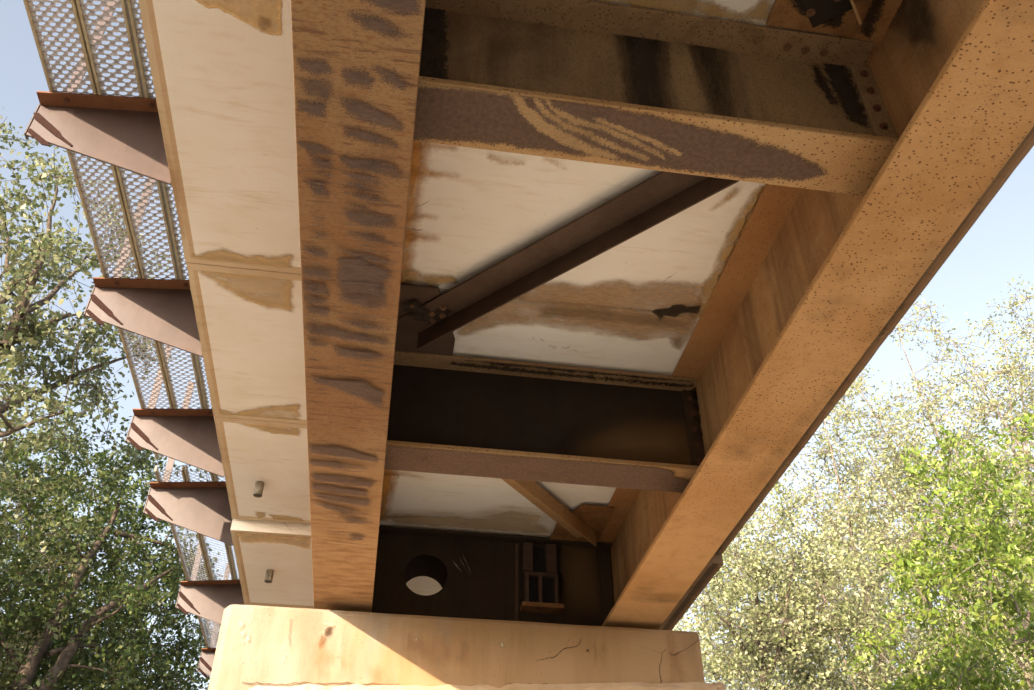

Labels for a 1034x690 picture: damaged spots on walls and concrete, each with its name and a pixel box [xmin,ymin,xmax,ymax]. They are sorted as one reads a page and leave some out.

damp [196,0,282,36]
rust [418,83,682,162]
damp [295,0,827,342]
damp [193,141,457,408]
damp [219,405,300,435]
damp [236,533,310,548]
damp [256,512,302,521]
damp [310,445,690,546]